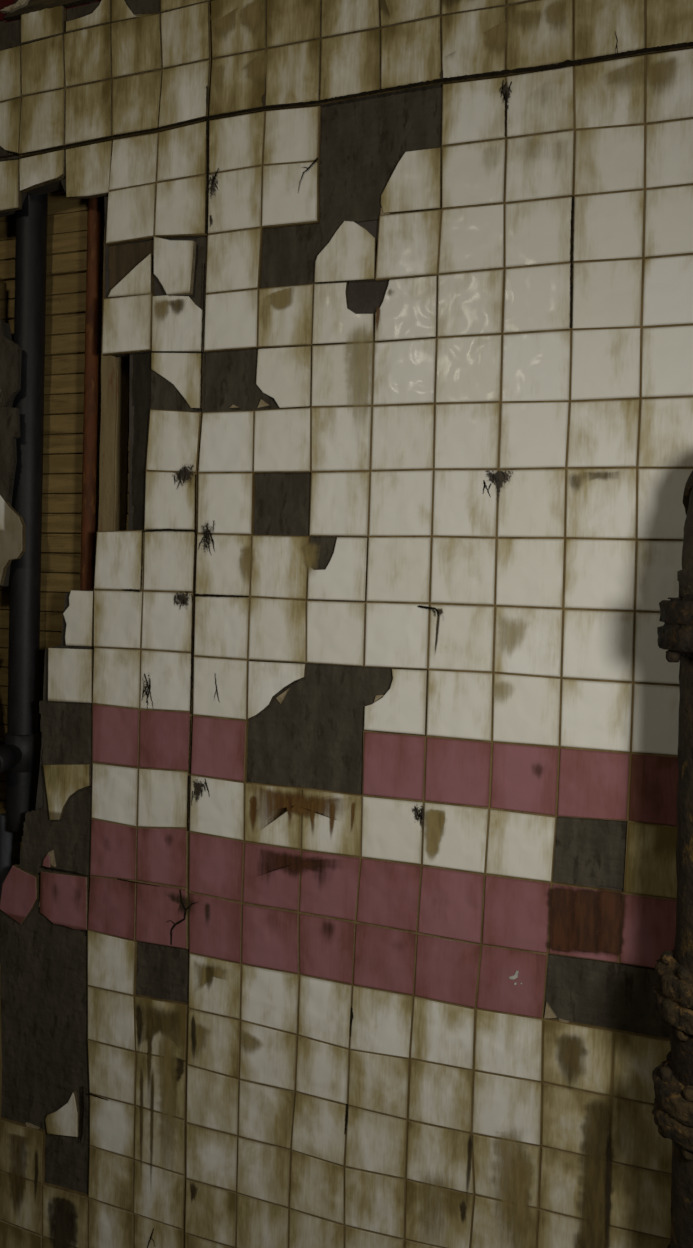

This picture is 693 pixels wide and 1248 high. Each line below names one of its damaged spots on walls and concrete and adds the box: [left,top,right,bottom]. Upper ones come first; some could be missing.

crack [0,32,693,412]
spalling [260,83,447,288]
spalling [132,348,281,530]
spalling [254,473,337,570]
crack [122,474,249,831]
spalling [246,663,396,794]
corrosion [250,790,337,833]
spalling [0,895,90,1194]
water stain [136,1006,206,1167]
water stain [558,1036,585,1082]
water stain [49,1198,76,1248]
water stain [575,1102,613,1248]